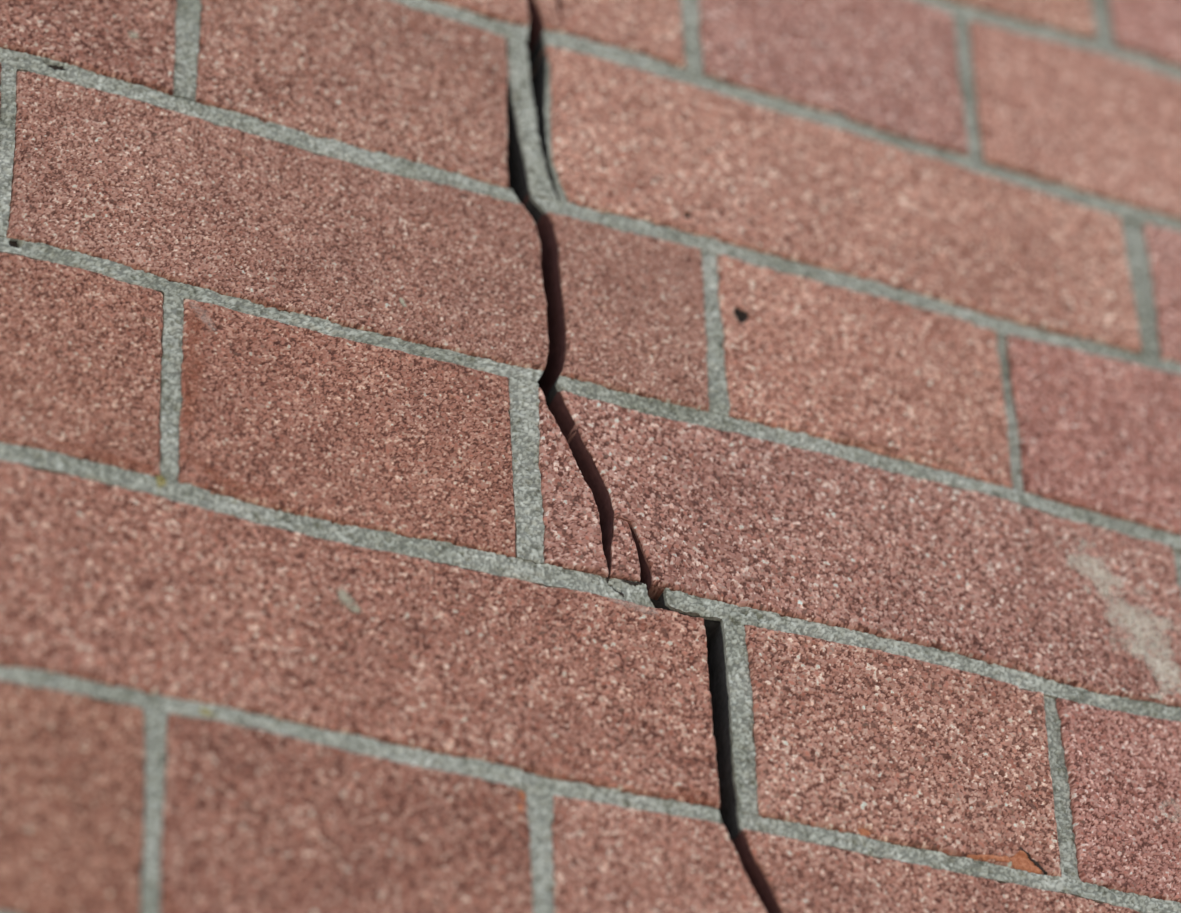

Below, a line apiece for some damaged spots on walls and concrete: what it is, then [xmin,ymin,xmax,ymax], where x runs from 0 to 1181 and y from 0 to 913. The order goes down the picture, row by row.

crack [506,0,782,913]